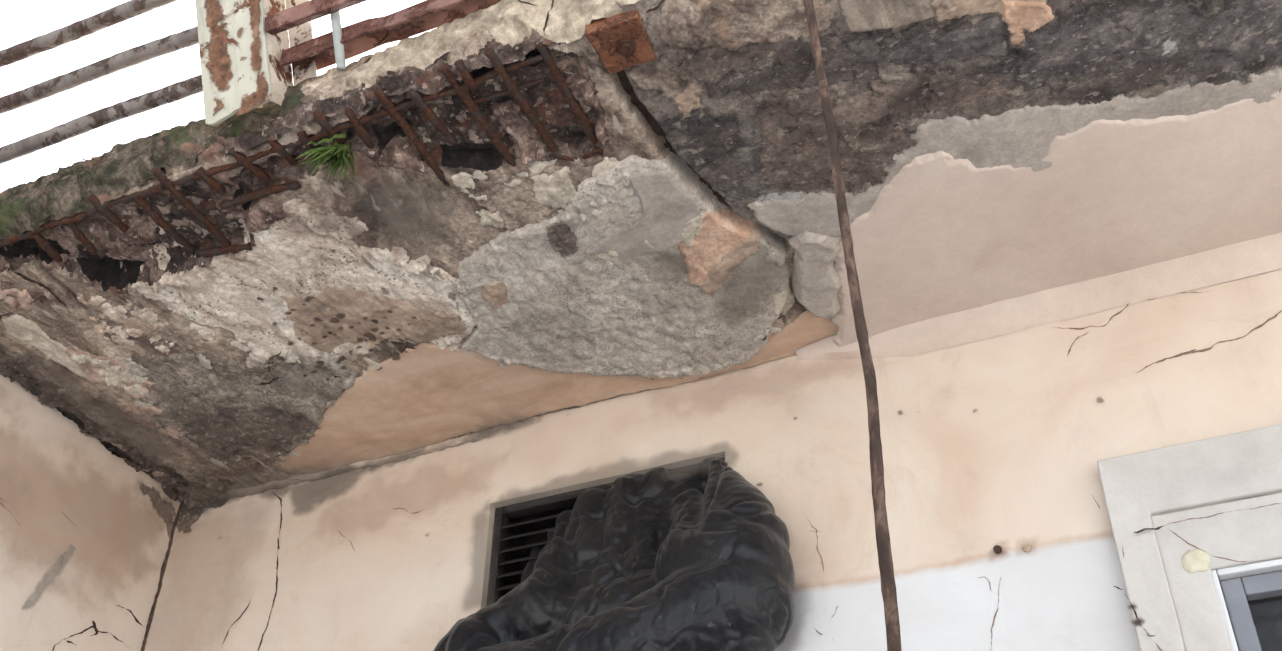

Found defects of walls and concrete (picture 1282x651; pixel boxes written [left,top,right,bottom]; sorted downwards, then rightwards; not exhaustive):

crack [639,0,665,16]
peeling [930,0,1054,50]
peeling [901,111,934,134]
peeling [1008,93,1041,110]
peeling [0,0,840,472]
crack [1052,291,1209,356]
crack [1136,310,1282,373]
spalling [56,406,190,503]
damp [0,347,532,537]
damp [24,546,75,608]
crack [52,500,184,651]
crack [223,495,282,651]